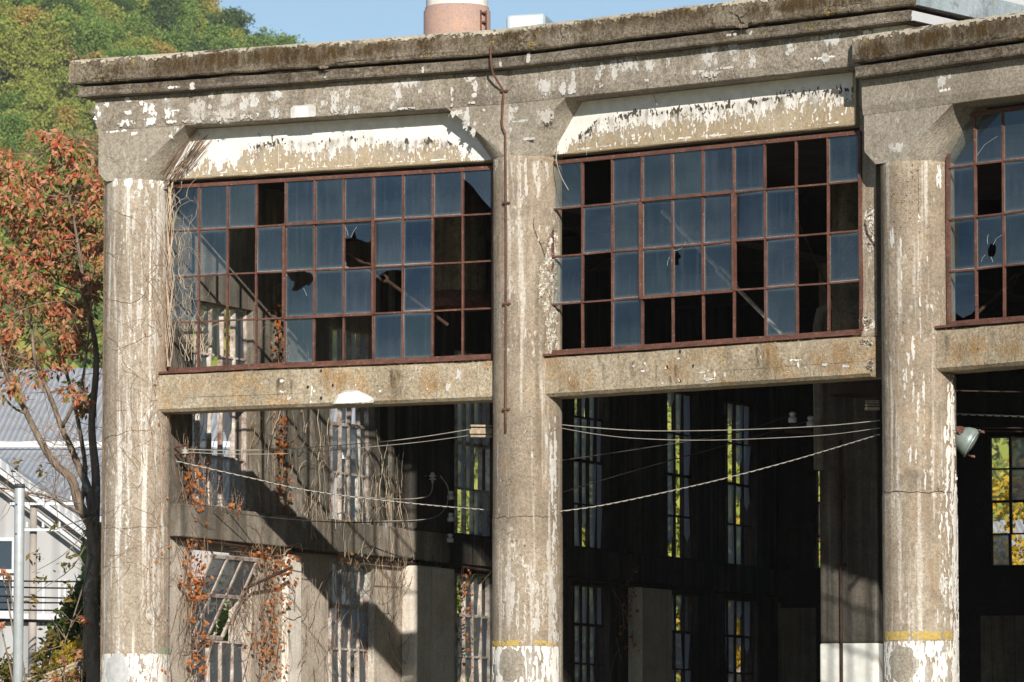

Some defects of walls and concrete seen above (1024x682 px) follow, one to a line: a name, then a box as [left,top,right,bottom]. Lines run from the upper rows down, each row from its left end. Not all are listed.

damp [112,178,166,371]
peeling [106,63,491,179]
efflorescence [495,158,549,207]
spalling [537,232,558,358]
peeling [508,21,853,155]
damp [882,228,902,259]